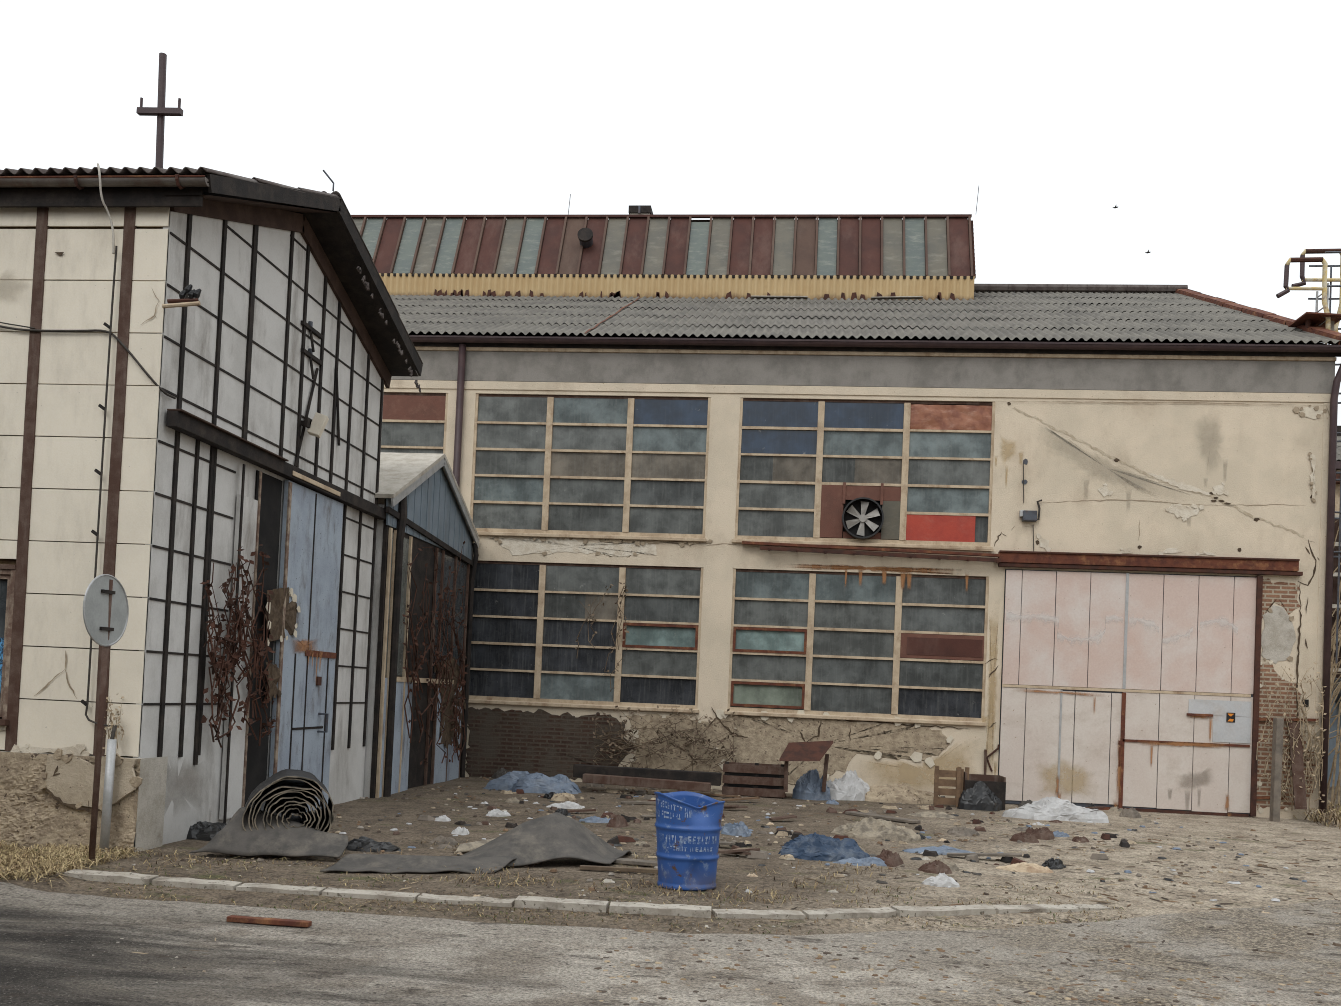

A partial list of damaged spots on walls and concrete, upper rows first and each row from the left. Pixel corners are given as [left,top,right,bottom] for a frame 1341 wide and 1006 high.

crack [1042,499,1305,540]
peeling [1165,482,1231,522]
flaking render [1256,578,1316,814]
flaking render [465,707,953,785]